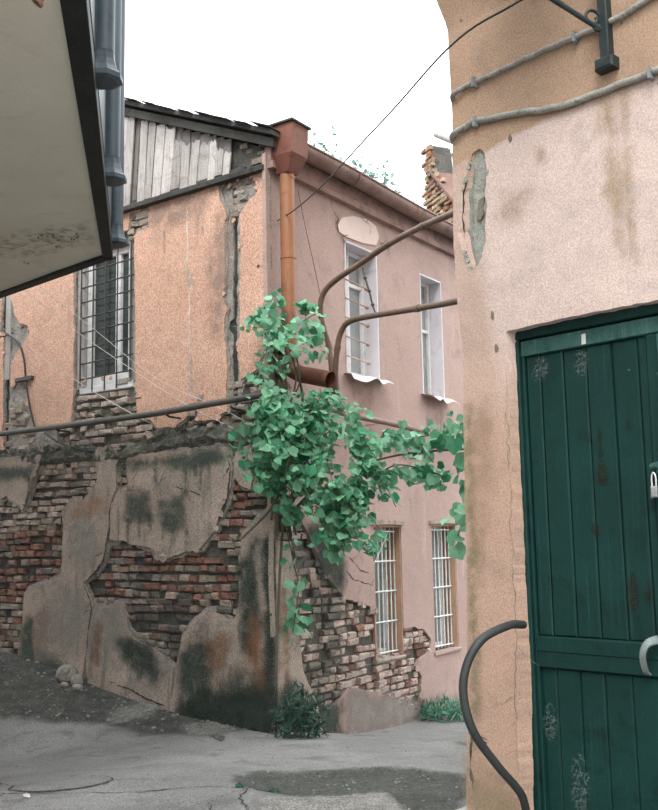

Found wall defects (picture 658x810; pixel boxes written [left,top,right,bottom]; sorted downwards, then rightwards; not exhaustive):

spalling [227,178,252,223]
spalling [462,150,489,271]
spalling [53,376,157,448]
spalling [170,377,264,431]
spalling [272,346,291,393]
spalling [0,461,97,653]
spalling [89,478,267,663]
leakage [250,535,277,733]
spalling [277,488,432,711]